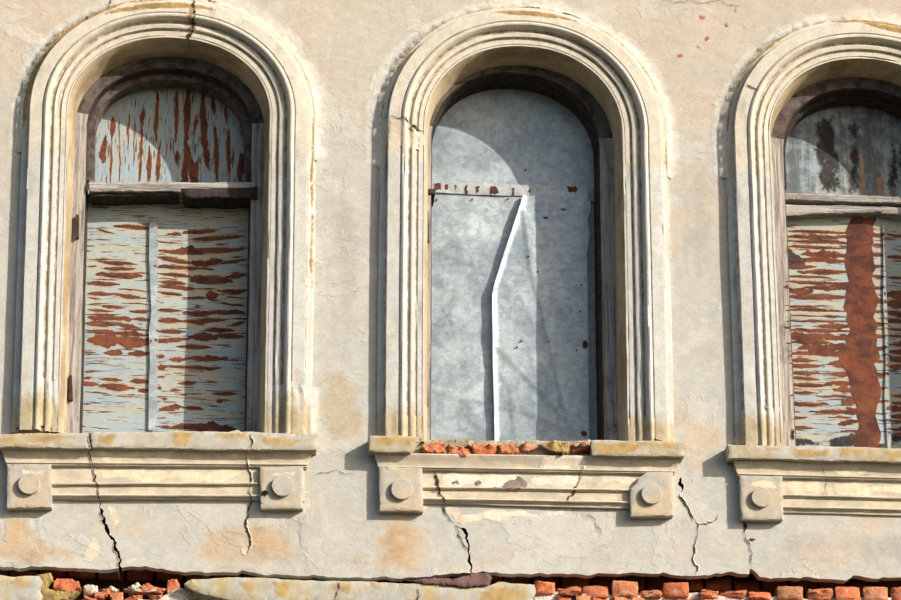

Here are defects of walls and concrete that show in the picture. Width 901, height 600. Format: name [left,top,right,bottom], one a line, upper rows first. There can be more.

corrosion [99,79,245,183]
corrosion [80,229,247,411]
corrosion [784,217,901,448]
crack [87,433,122,579]
corrosion [161,420,237,432]
crack [244,434,255,553]
crack [433,470,472,573]
peeling [423,504,565,525]
peeling [440,440,590,492]
peeling [598,474,635,485]
crack [678,477,718,573]
spalling [37,573,192,600]